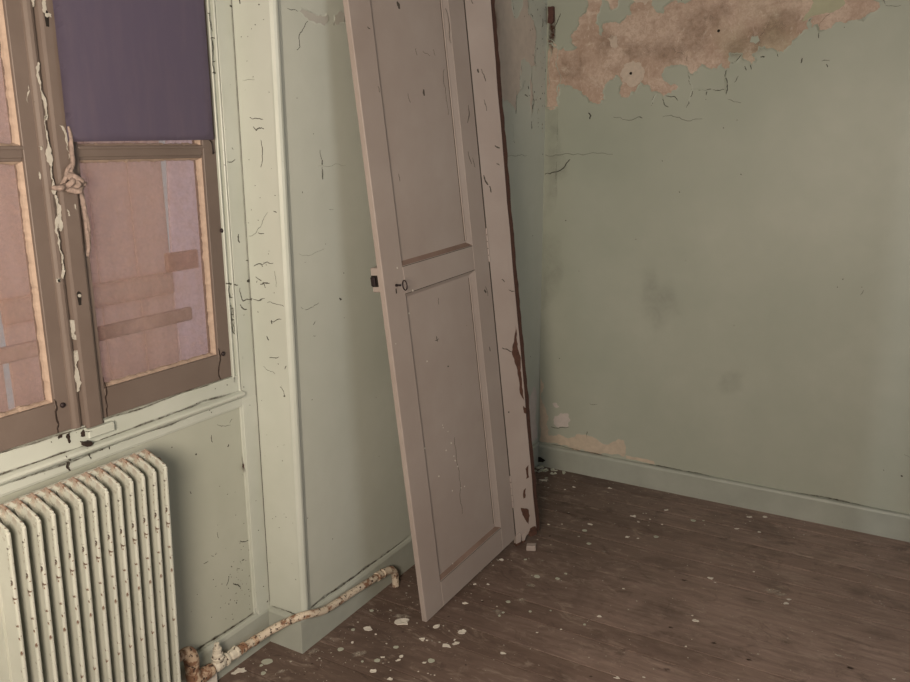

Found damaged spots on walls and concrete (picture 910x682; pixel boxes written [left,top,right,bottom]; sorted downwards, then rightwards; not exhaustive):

crack [614,32,780,121]
peeling [534,0,882,114]
peeling [27,62,76,283]
peeling [69,320,81,392]
crack [204,0,317,600]
peeling [521,466,537,537]